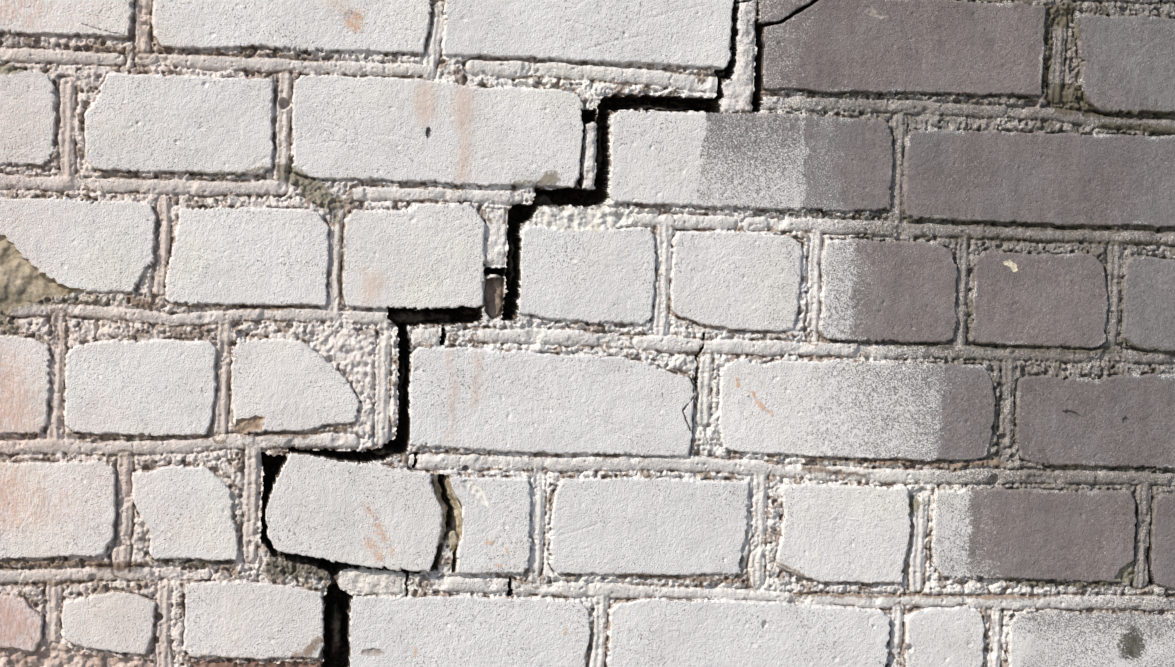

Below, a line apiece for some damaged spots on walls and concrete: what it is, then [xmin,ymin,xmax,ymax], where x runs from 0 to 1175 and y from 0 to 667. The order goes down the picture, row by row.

spalling [0,235,87,315]
crack [260,0,819,667]